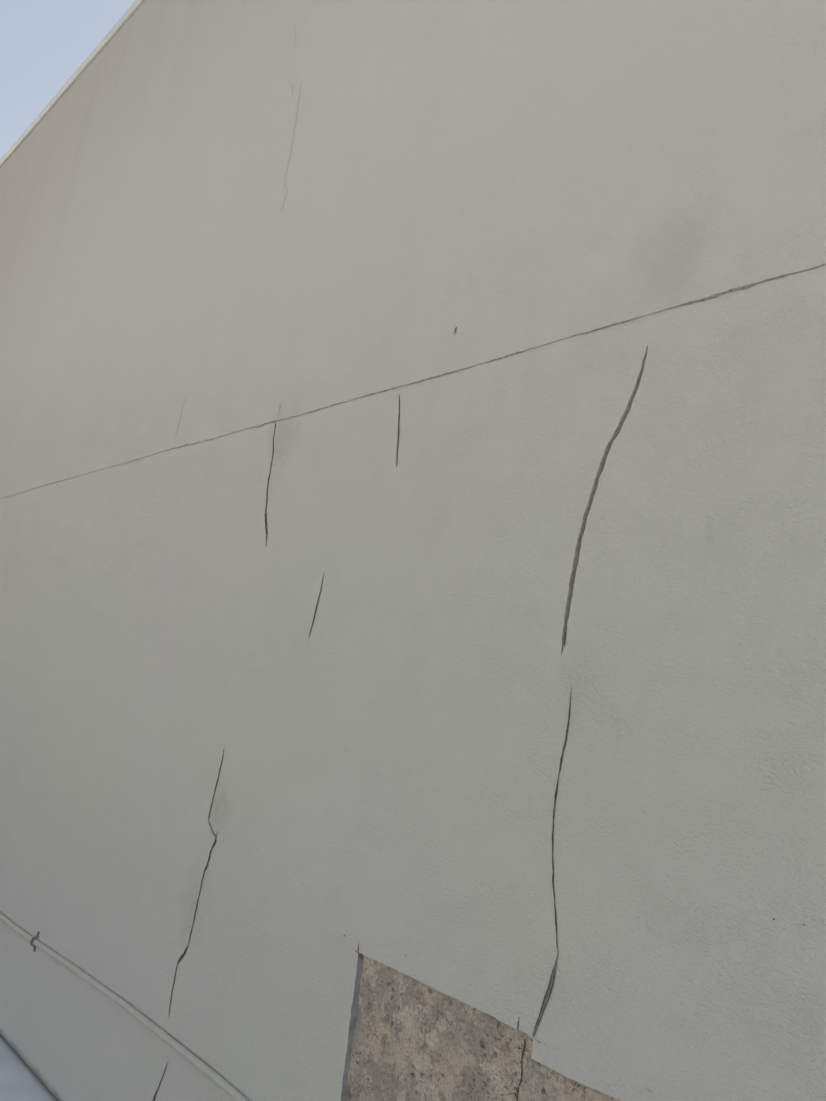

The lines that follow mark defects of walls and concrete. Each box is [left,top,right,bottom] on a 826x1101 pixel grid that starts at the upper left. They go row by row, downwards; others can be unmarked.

crack [0,264,826,656]
crack [169,750,224,1012]
spalling [341,943,620,1101]
crack [516,694,571,1101]